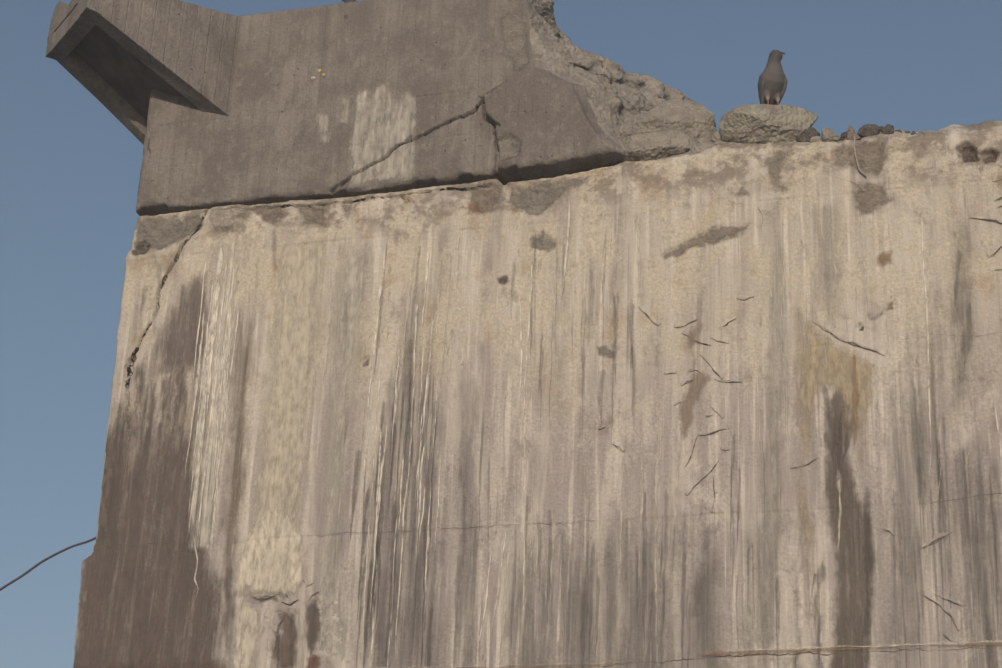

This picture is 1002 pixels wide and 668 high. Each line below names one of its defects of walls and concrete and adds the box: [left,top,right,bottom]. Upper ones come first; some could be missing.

crack [394,102,500,152]
spalling [961,146,1002,182]
crack [280,186,488,210]
spalling [530,231,557,251]
spalling [664,227,746,258]
crack [125,210,207,394]
damp [74,241,370,668]
damp [358,238,460,668]
damp [826,391,874,668]